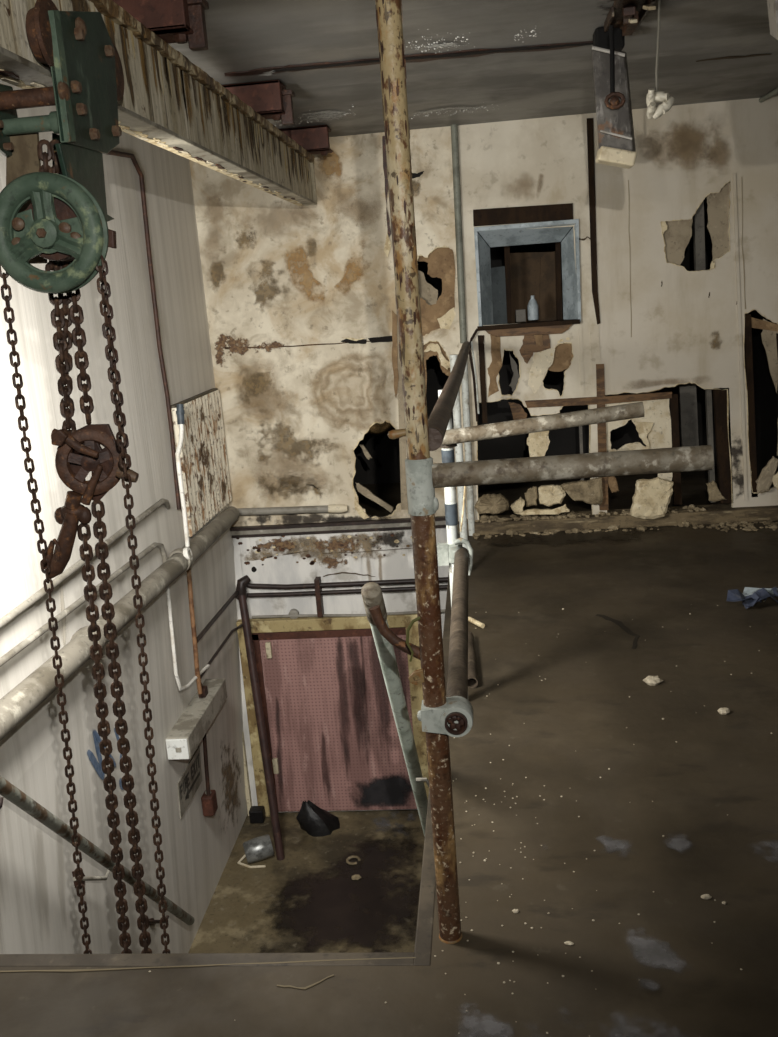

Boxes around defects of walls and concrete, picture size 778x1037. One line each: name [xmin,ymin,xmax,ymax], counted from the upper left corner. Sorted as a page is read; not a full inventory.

damp [320,151,342,176]
spalling [215,0,456,445]
spalling [660,181,731,272]
damp [211,262,225,288]
damp [255,240,324,304]
damp [335,258,362,291]
peeling [480,334,574,420]
damp [260,423,336,462]
spalling [527,431,550,457]
spalling [605,382,732,494]
damp [259,476,321,496]
spalling [233,420,417,619]